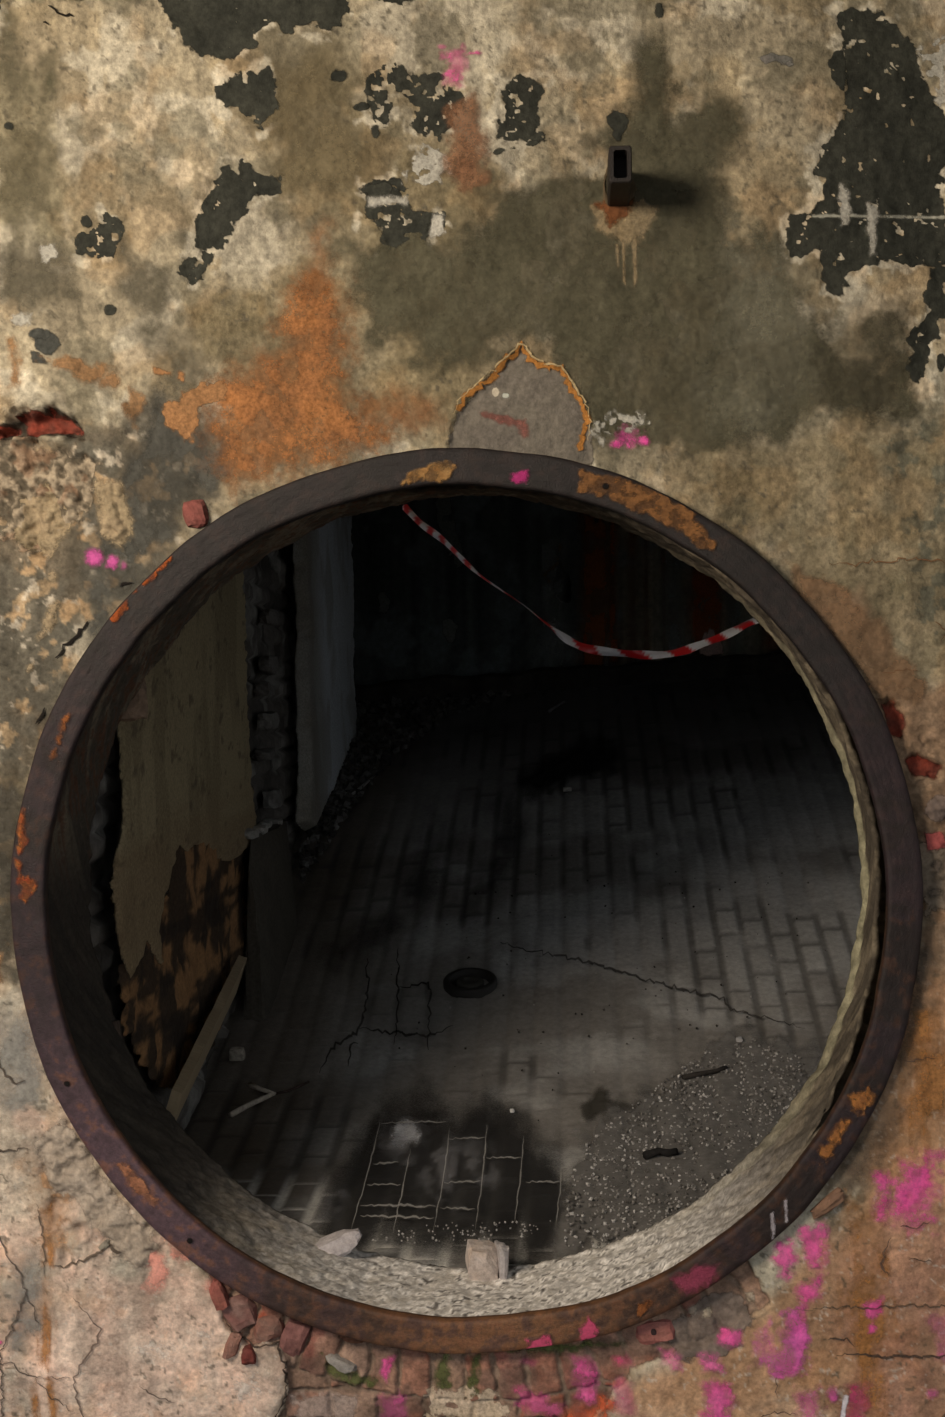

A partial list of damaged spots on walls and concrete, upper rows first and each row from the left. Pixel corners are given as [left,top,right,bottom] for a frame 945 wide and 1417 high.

peeling [158,0,350,130]
corrosion [590,198,657,285]
leakage [339,37,918,451]
peeling [785,7,945,383]
corrosion [153,273,390,487]
spalling [448,341,650,465]
corrosion [577,469,716,550]
crack [500,942,800,1028]
leakage [321,1090,576,1265]
crack [0,1205,121,1417]
flaking render [209,1261,769,1417]
crack [801,1221,945,1360]